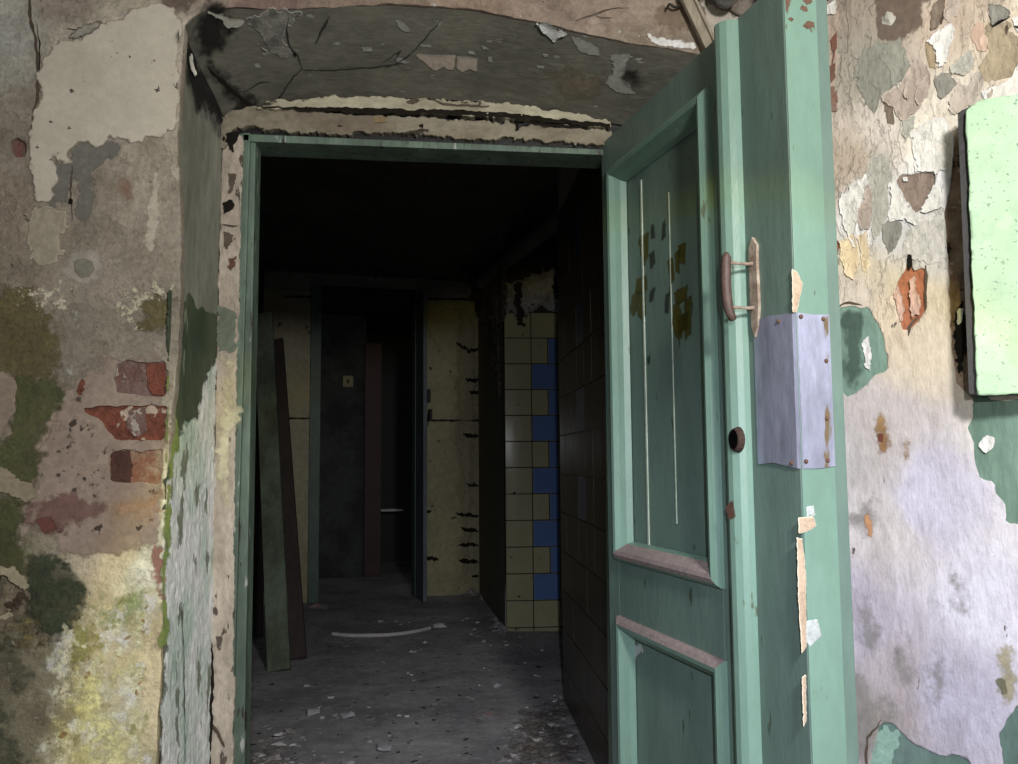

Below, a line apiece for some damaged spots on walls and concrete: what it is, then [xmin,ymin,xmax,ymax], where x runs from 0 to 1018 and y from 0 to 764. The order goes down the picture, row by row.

crack [28,0,41,128]
crack [207,17,610,128]
crack [576,7,628,21]
peeling [827,0,841,112]
peeling [12,2,197,266]
peeling [837,0,1018,524]
peeling [0,371,17,438]
flaking render [0,467,106,534]
peeling [85,290,243,764]
spalling [0,566,32,631]
peeling [870,722,970,764]
peeling [999,706,1018,764]